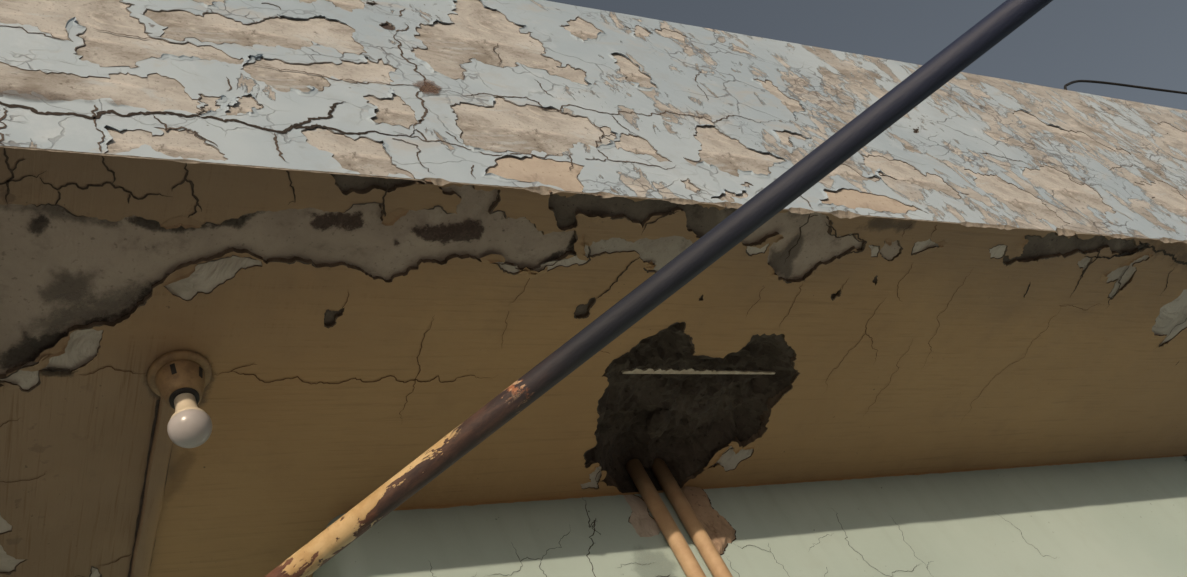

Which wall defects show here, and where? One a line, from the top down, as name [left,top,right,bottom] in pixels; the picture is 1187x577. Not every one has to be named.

peeling [0,0,418,129]
crack [0,9,778,221]
leakage [129,213,255,232]
leakage [310,212,364,231]
spalling [0,78,813,392]
leakage [412,220,484,245]
spalling [741,154,1187,300]
leakage [0,332,72,377]
crack [214,316,494,414]
spalling [580,322,799,493]
crack [473,500,670,577]
crack [808,512,933,577]